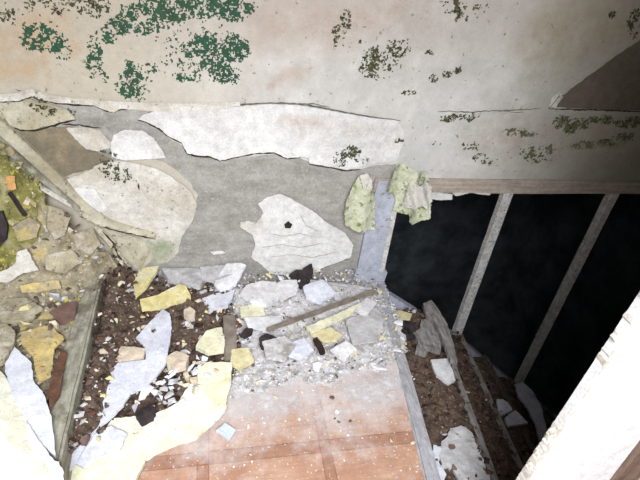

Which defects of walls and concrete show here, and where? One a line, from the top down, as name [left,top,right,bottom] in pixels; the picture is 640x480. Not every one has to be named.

flaking render [0,0,491,308]
crack [438,92,640,113]
flaking render [549,8,640,150]